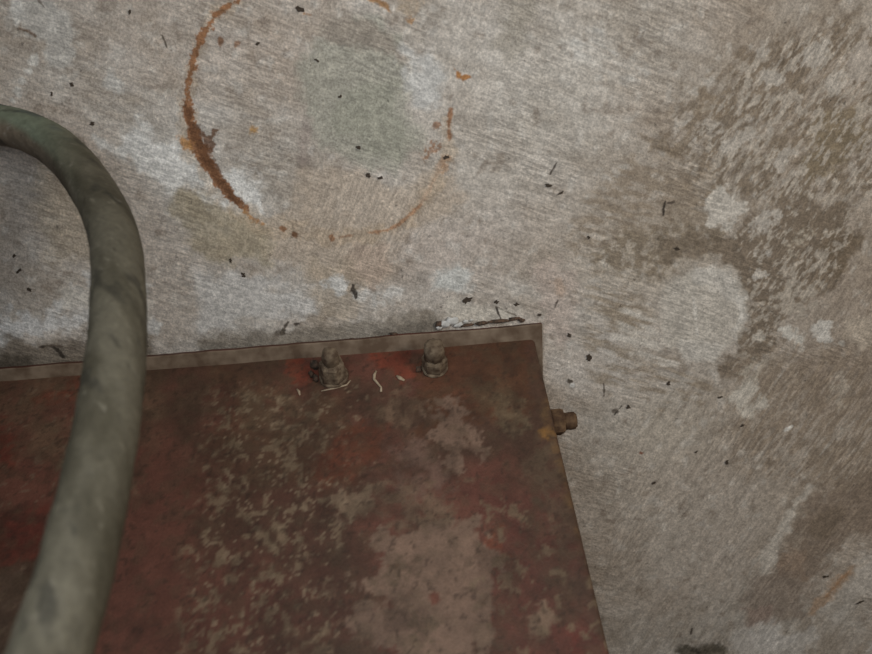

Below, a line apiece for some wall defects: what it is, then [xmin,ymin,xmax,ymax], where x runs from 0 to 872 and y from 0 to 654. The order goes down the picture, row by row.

rust [173,0,461,251]
damp [524,222,729,351]